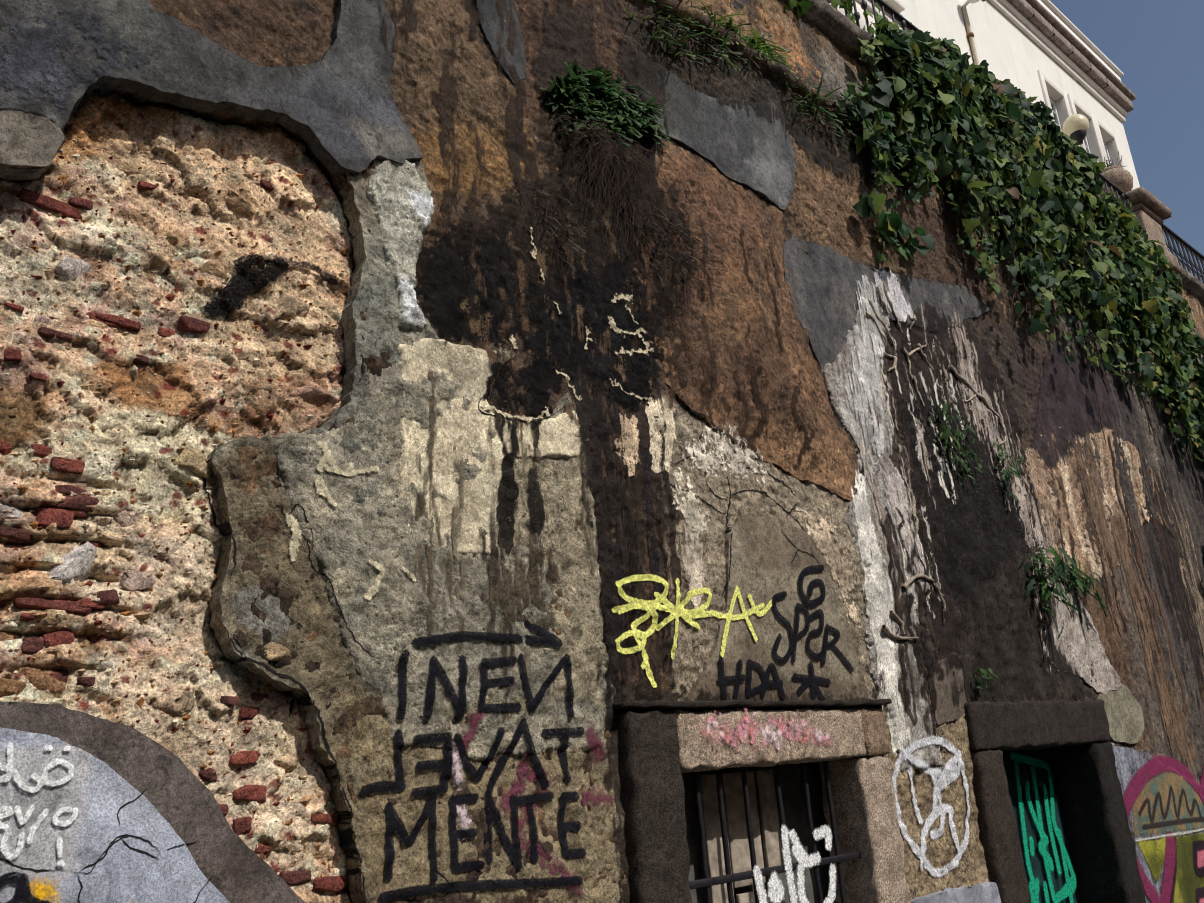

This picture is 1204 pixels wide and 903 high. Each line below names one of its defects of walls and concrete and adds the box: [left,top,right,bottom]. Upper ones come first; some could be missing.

crack [0,788,200,903]
spalling [0,0,424,903]
damp [366,0,1204,903]